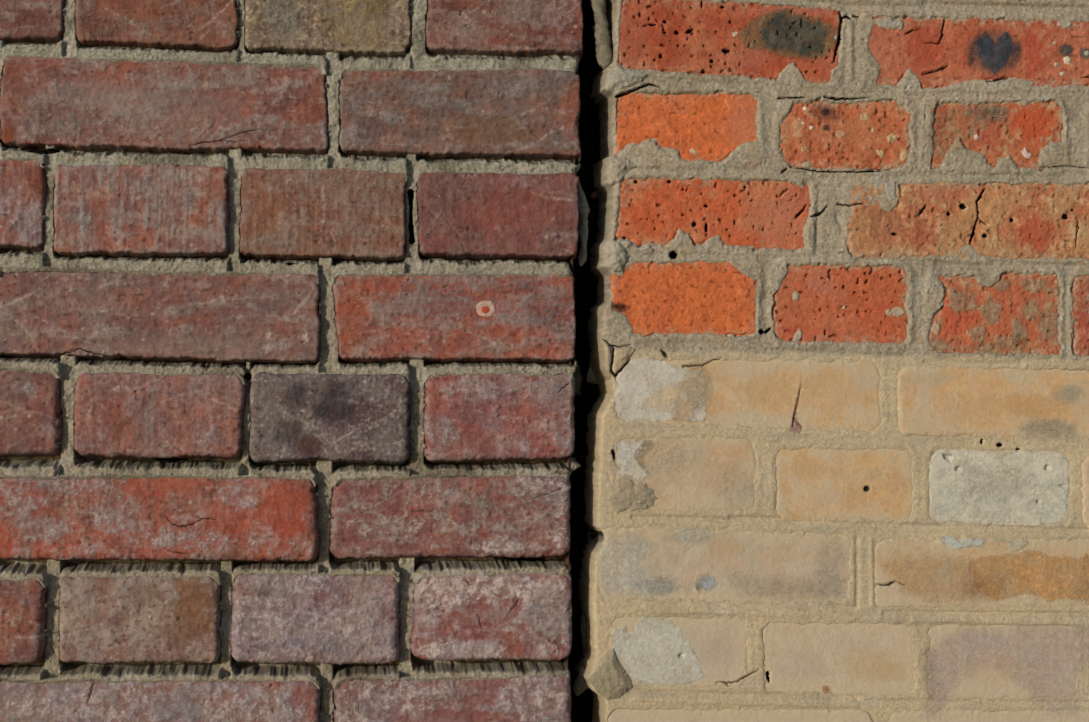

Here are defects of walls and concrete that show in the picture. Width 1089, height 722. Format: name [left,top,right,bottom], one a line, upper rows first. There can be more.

crack [834,16,859,59]
crack [970,189,984,242]
peeling [615,357,708,423]
peeling [929,449,1070,526]
crack [166,516,214,554]
peeling [892,536,1089,601]
peeling [611,617,705,686]